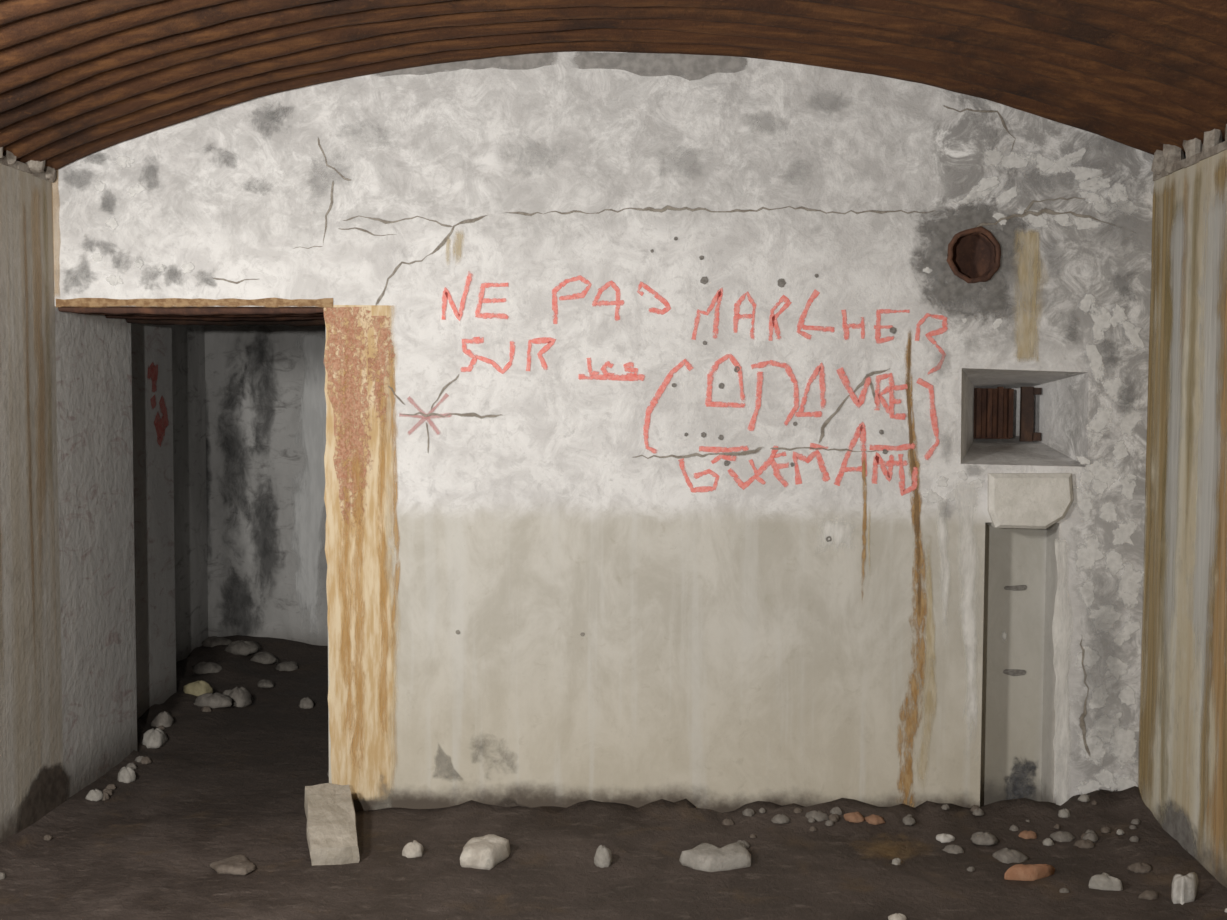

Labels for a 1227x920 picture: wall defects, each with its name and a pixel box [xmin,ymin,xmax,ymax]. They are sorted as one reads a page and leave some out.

crack [293,138,932,305]
damp [914,202,1025,318]
crack [977,197,1133,232]
corrosion [56,298,400,800]
damp [206,338,277,636]
damp [292,335,326,627]
crack [389,374,499,451]
crack [635,370,887,459]
corrosion [897,337,936,806]
corrosion [1139,186,1175,789]
corrosion [1200,162,1227,855]
damp [1160,802,1196,858]